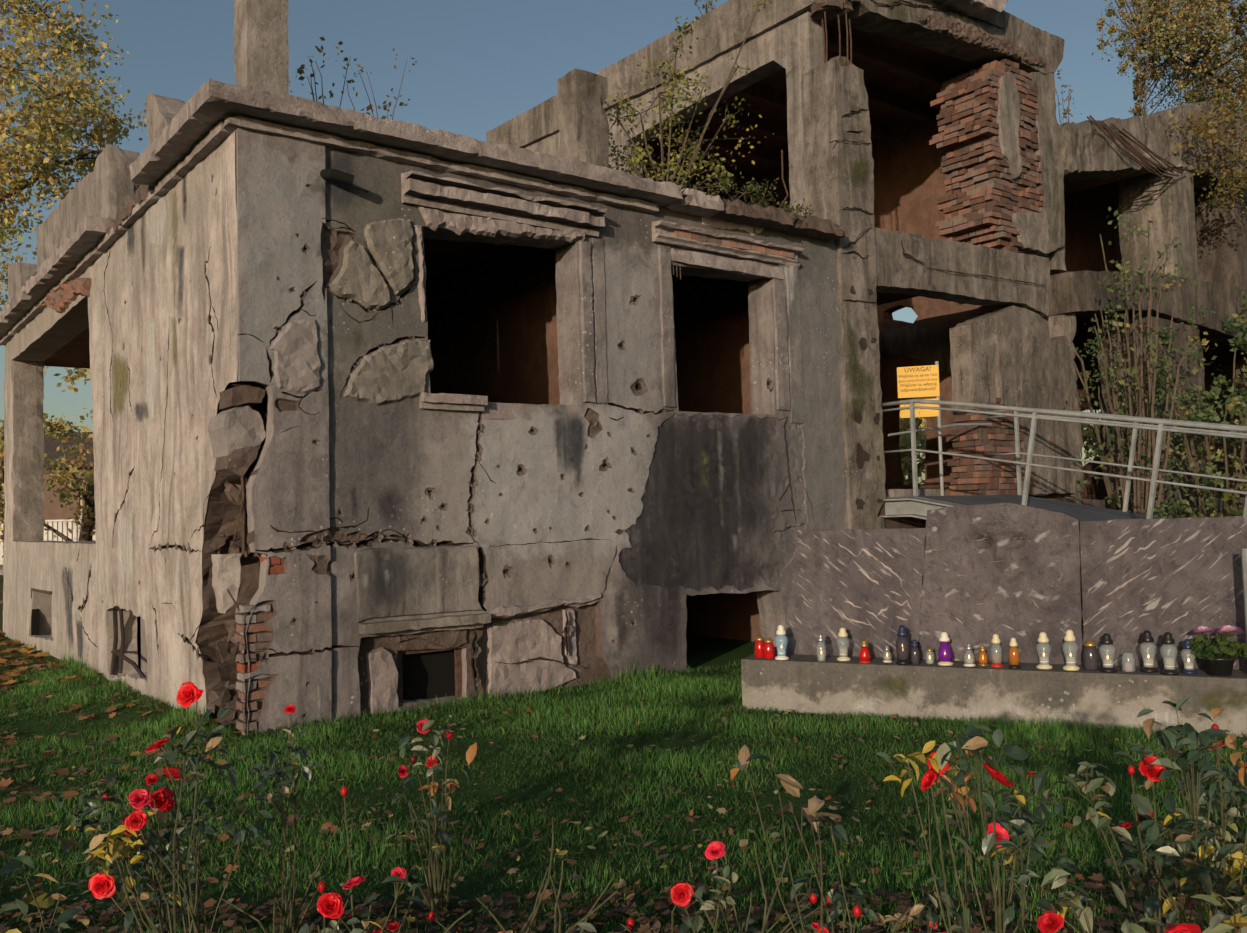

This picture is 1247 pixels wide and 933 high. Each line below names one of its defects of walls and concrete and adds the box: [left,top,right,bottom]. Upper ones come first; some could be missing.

crack [830,109,870,144]
spalling [320,222,358,302]
spalling [40,278,92,313]
crack [65,218,617,736]
damp [556,418,582,481]
spalling [584,408,603,439]
spalling [235,600,279,736]